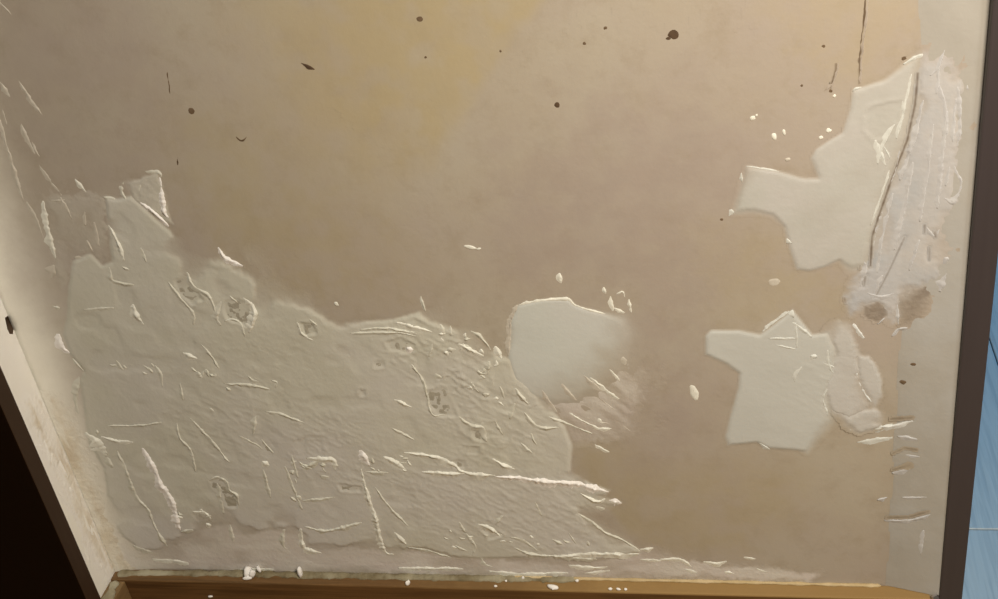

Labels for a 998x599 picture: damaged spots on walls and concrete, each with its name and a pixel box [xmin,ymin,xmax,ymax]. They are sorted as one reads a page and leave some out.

crack [824,0,869,93]
peeling [119,171,176,226]
peeling [20,388,148,585]